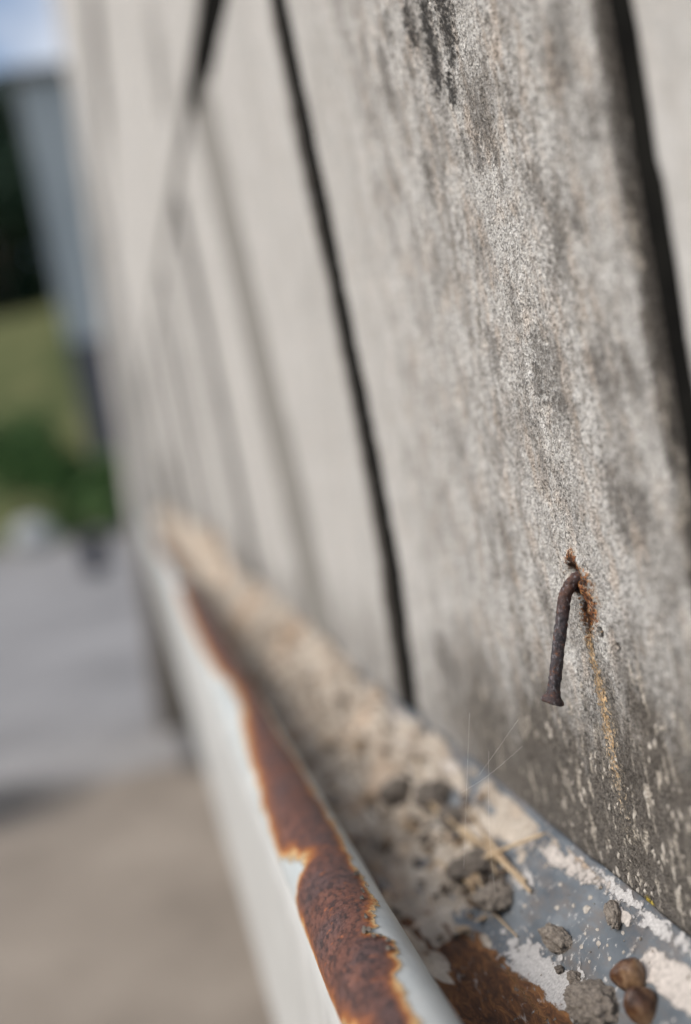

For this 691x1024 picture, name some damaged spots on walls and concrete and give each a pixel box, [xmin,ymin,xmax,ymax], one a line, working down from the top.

rust [564,548,620,789]
rust [177,583,424,1024]
rust [398,912,573,1024]